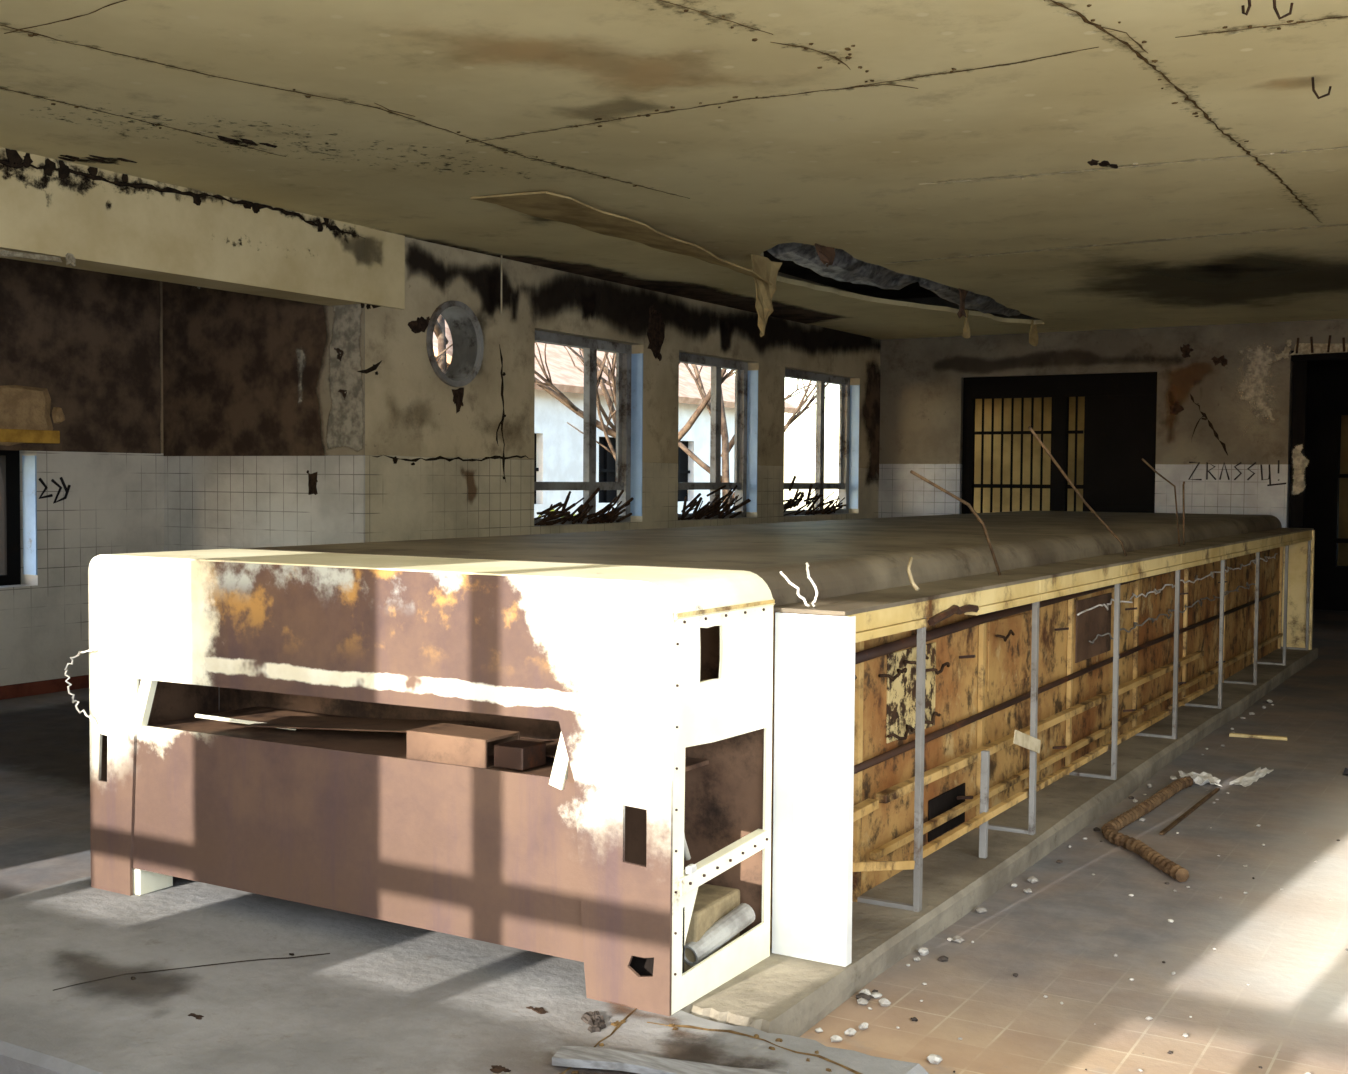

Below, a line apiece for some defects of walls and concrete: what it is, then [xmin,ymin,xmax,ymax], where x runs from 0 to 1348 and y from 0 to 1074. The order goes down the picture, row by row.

leakage [89,108,485,175]
crack [0,0,1348,264]
crack [361,302,380,310]
leakage [511,290,519,320]
leakage [720,322,733,352]
leakage [297,349,305,402]
peeling [1211,335,1348,421]
spalling [0,385,65,446]